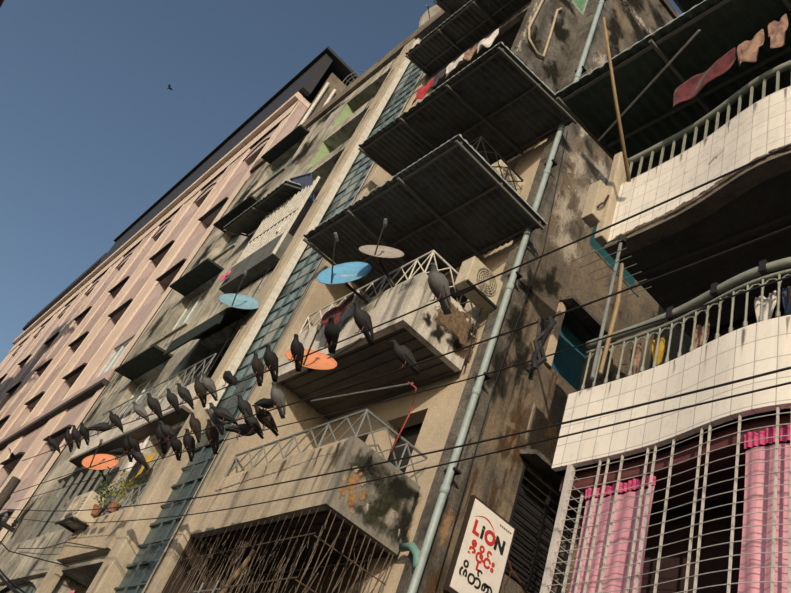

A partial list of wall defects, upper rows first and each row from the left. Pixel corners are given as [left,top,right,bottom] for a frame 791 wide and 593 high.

water stain [527,26,540,53]
water stain [552,0,573,42]
water stain [543,61,560,85]
water stain [553,152,610,261]
water stain [424,313,477,354]
flaking render [339,466,367,513]
water stain [351,449,419,543]